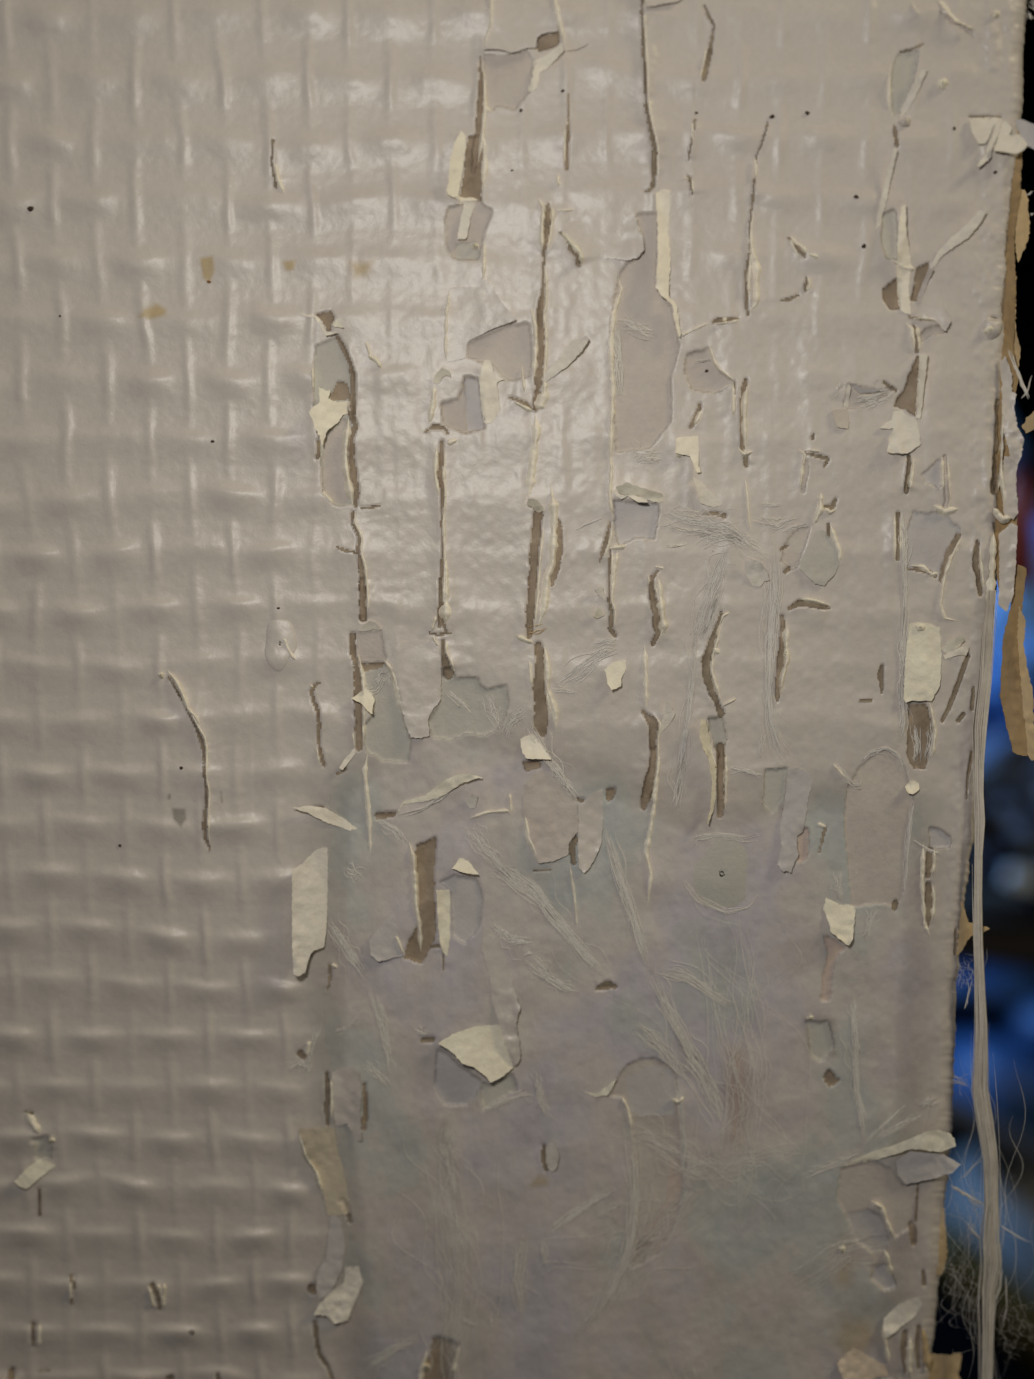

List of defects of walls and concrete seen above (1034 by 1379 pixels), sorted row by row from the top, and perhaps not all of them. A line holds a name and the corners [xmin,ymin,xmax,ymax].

peeling [445,136,492,260]
peeling [875,147,986,315]
peeling [301,310,360,507]
peeling [428,360,505,434]
peeling [604,213,734,507]
peeling [880,410,921,454]
crack [158,672,212,851]
peeling [292,848,328,976]
peeling [351,689,375,714]
peeling [369,837,483,970]
peeling [763,768,827,873]
peeling [813,747,914,1002]